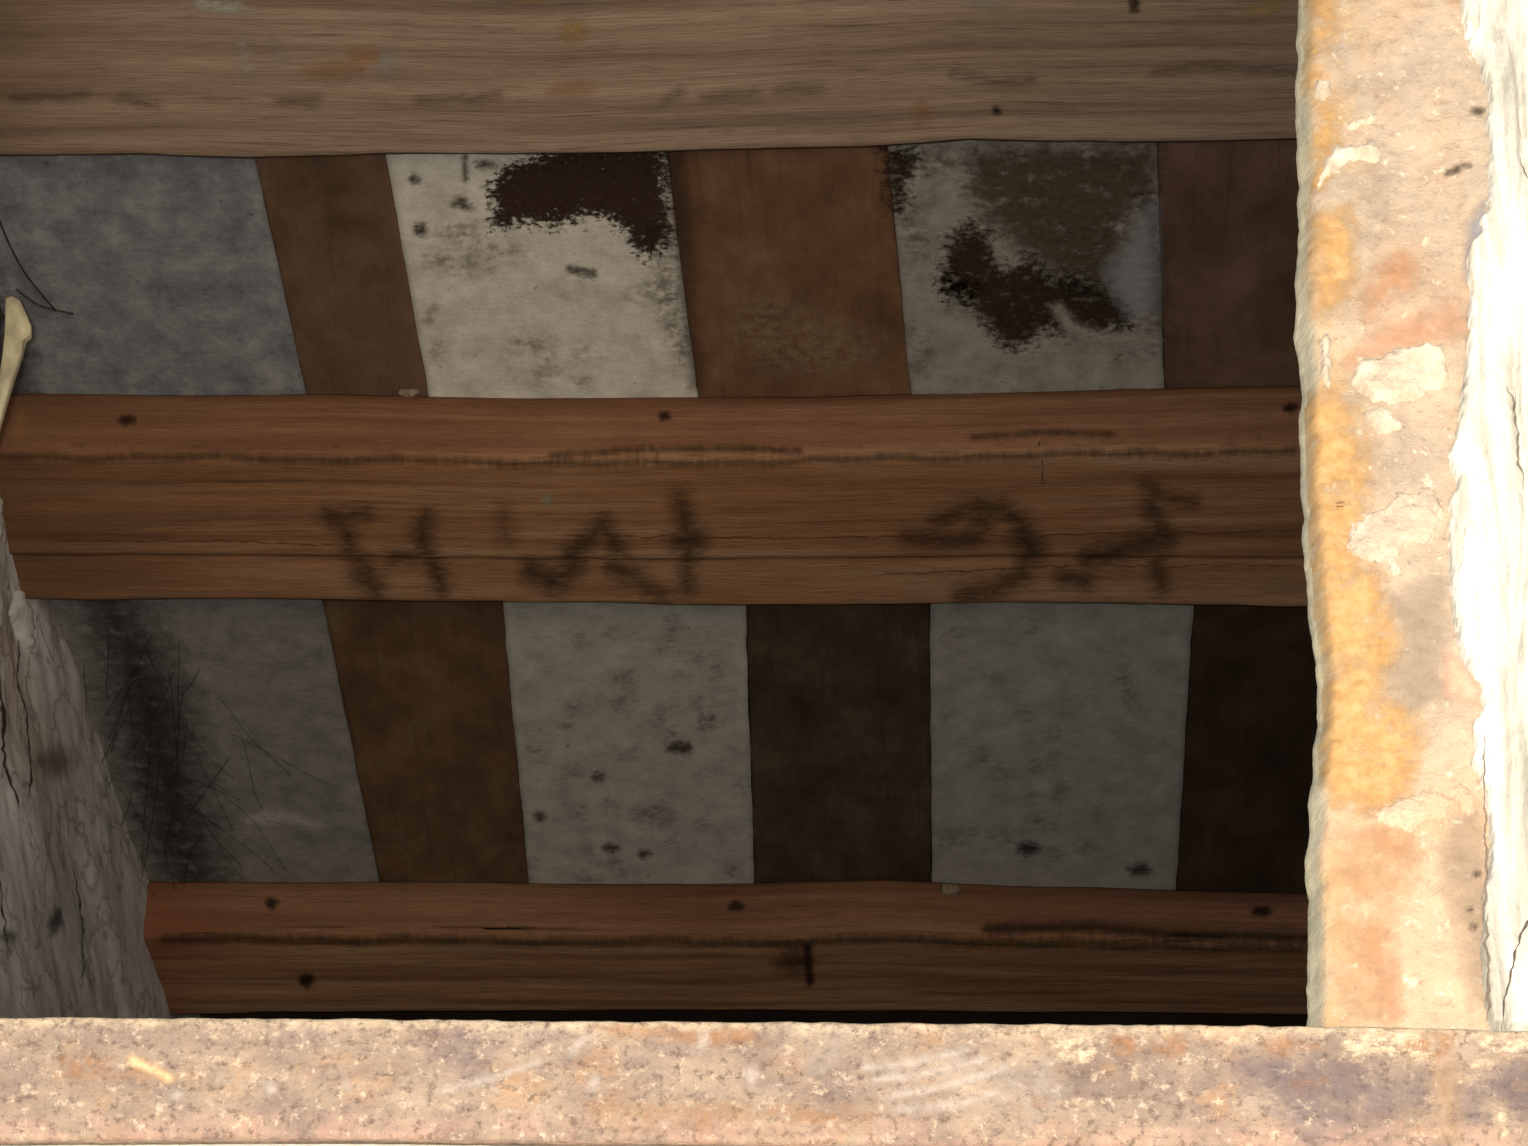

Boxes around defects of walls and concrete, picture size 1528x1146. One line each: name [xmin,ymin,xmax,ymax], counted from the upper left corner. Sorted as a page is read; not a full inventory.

damp [452,152,681,327]
damp [876,143,1163,354]
damp [100,600,214,882]
crack [1482,727,1528,1030]